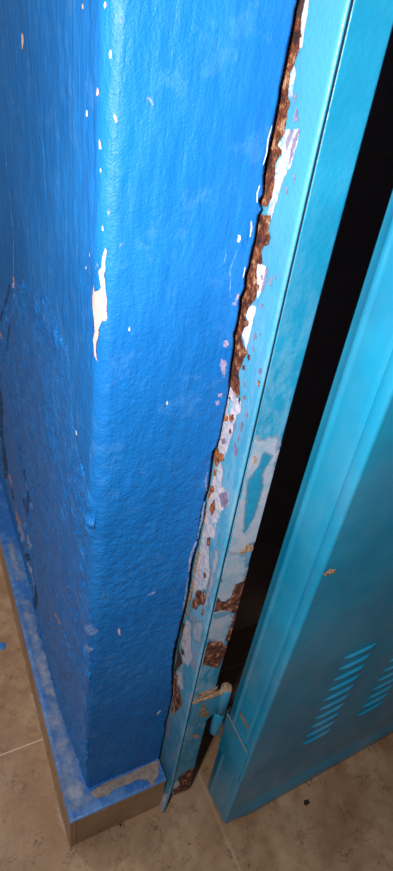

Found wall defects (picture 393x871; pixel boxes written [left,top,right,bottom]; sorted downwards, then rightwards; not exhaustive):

peeling [299,0,309,48]
rust [229,0,305,399]
peeling [263,66,300,219]
peeling [89,248,107,362]
peeling [242,264,276,360]
peeling [10,511,39,586]
rust [203,447,224,524]
peeling [177,387,280,691]
rust [172,538,246,715]
peeling [20,600,160,807]
rust [172,768,194,794]